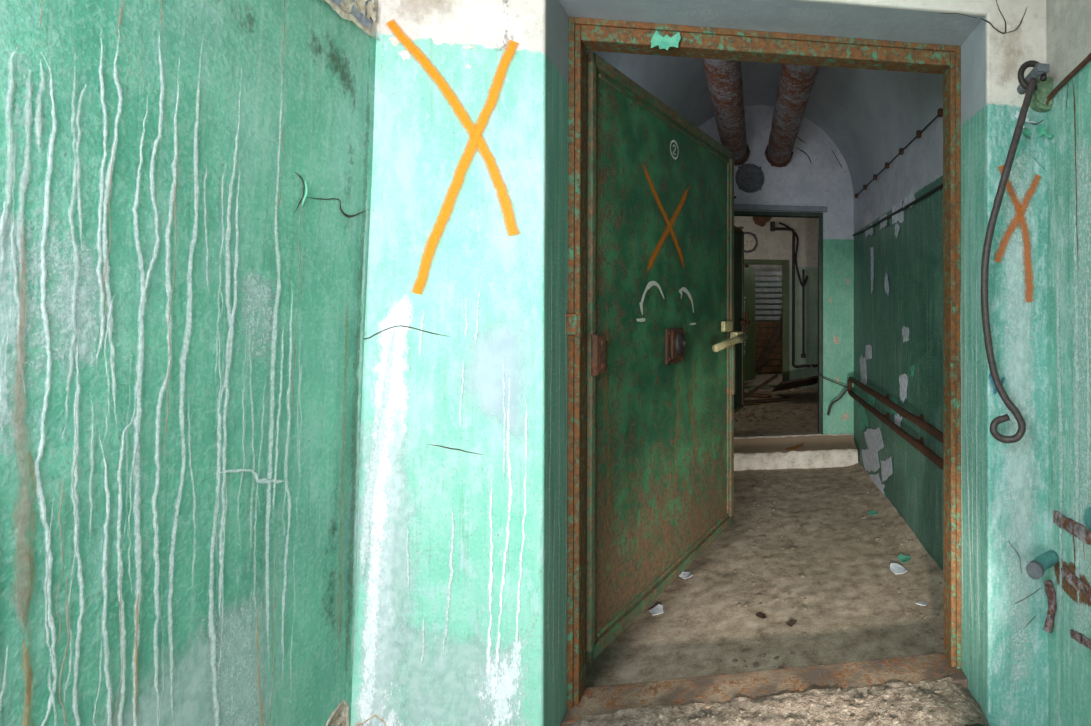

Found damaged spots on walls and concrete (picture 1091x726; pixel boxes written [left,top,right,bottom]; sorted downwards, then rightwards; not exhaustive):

peeling [324,0,410,61]
crack [294,173,369,218]
damp [0,0,302,726]
damp [352,289,527,726]
rust [1054,536,1091,606]
flaking render [326,700,386,726]